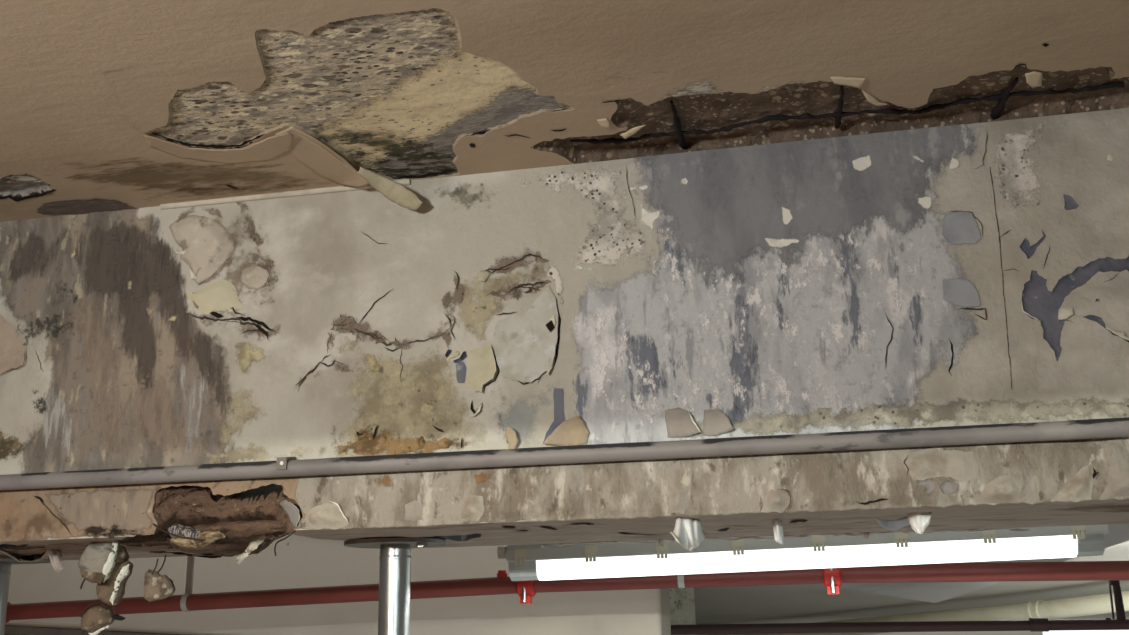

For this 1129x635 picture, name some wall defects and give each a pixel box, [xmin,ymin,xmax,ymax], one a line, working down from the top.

peeling [0,316,43,375]
flaking render [0,174,137,216]
damp [0,208,277,476]
damp [69,161,305,195]
peeling [181,280,244,315]
flaking render [235,343,264,372]
peeling [103,8,577,211]
crack [295,249,551,390]
peeling [455,64,1129,449]
peeling [0,437,1129,575]